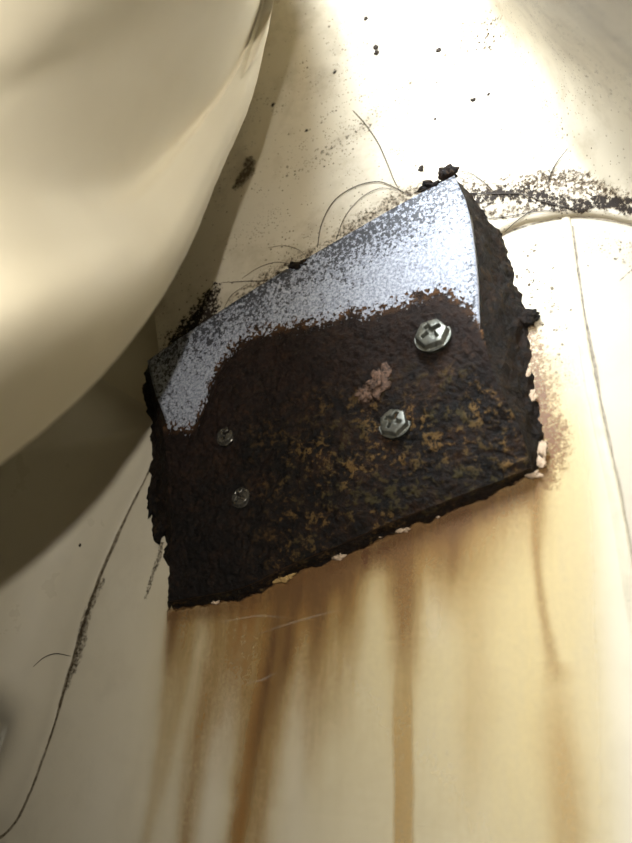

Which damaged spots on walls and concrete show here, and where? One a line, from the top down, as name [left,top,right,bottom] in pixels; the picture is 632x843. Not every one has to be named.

rust [416,164,460,193]
rust [288,259,308,269]
rust [146,281,588,843]